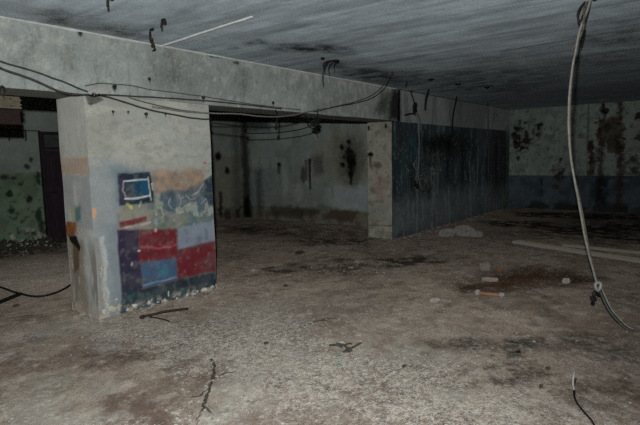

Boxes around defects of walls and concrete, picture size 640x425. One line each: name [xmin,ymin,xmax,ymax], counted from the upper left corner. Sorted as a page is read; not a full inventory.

crack [190,359,235,425]